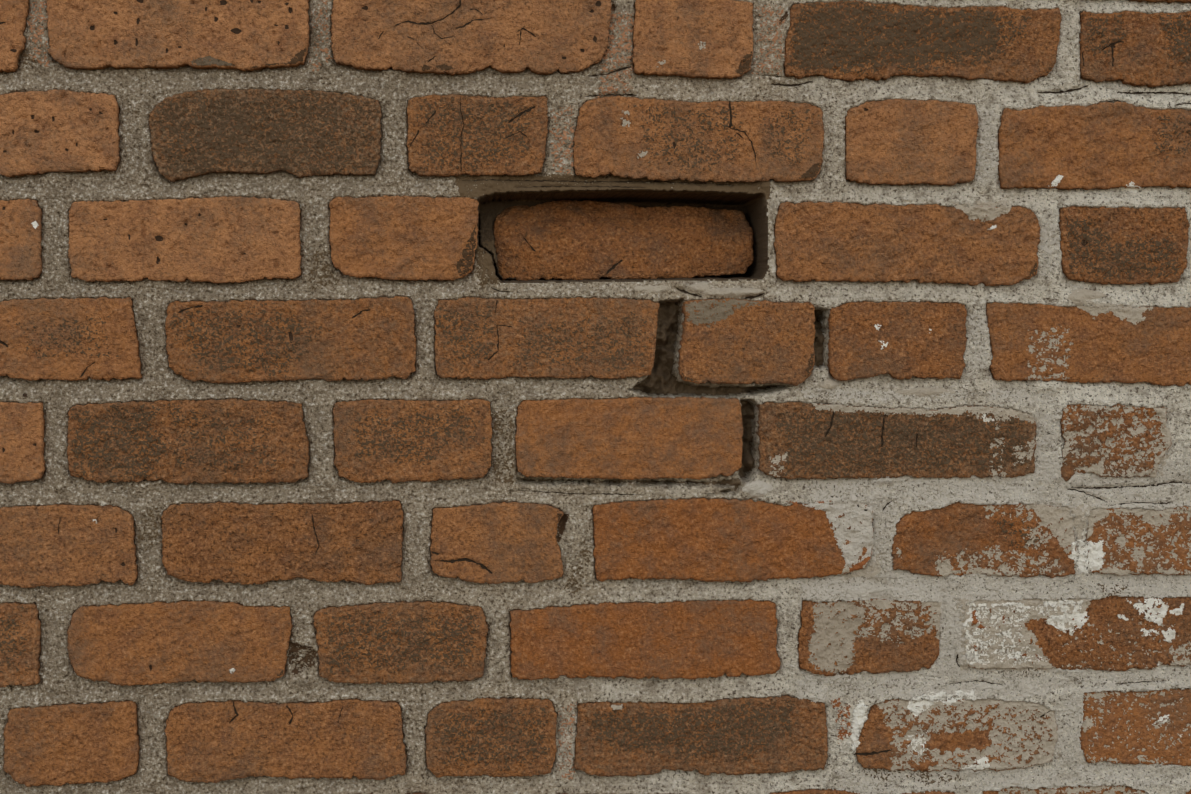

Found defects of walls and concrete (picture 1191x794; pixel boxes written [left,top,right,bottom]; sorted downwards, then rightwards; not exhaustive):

damp [858,767,964,786]